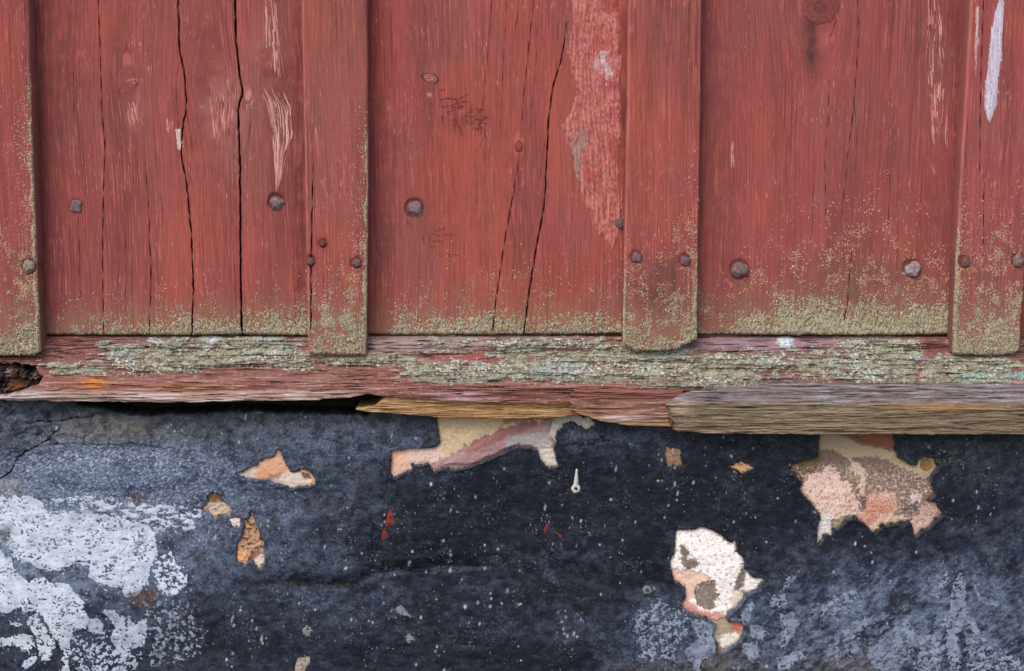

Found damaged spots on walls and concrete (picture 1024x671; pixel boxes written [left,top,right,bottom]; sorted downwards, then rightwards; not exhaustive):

crack [66,0,276,357]
crack [481,2,567,335]
peeling [562,0,624,249]
peeling [974,0,1004,122]
crack [0,404,198,479]
flaking render [236,449,315,488]
flaking render [390,415,594,477]
flaking render [789,434,941,543]
peeling [0,489,265,671]
flaking render [625,527,1024,671]